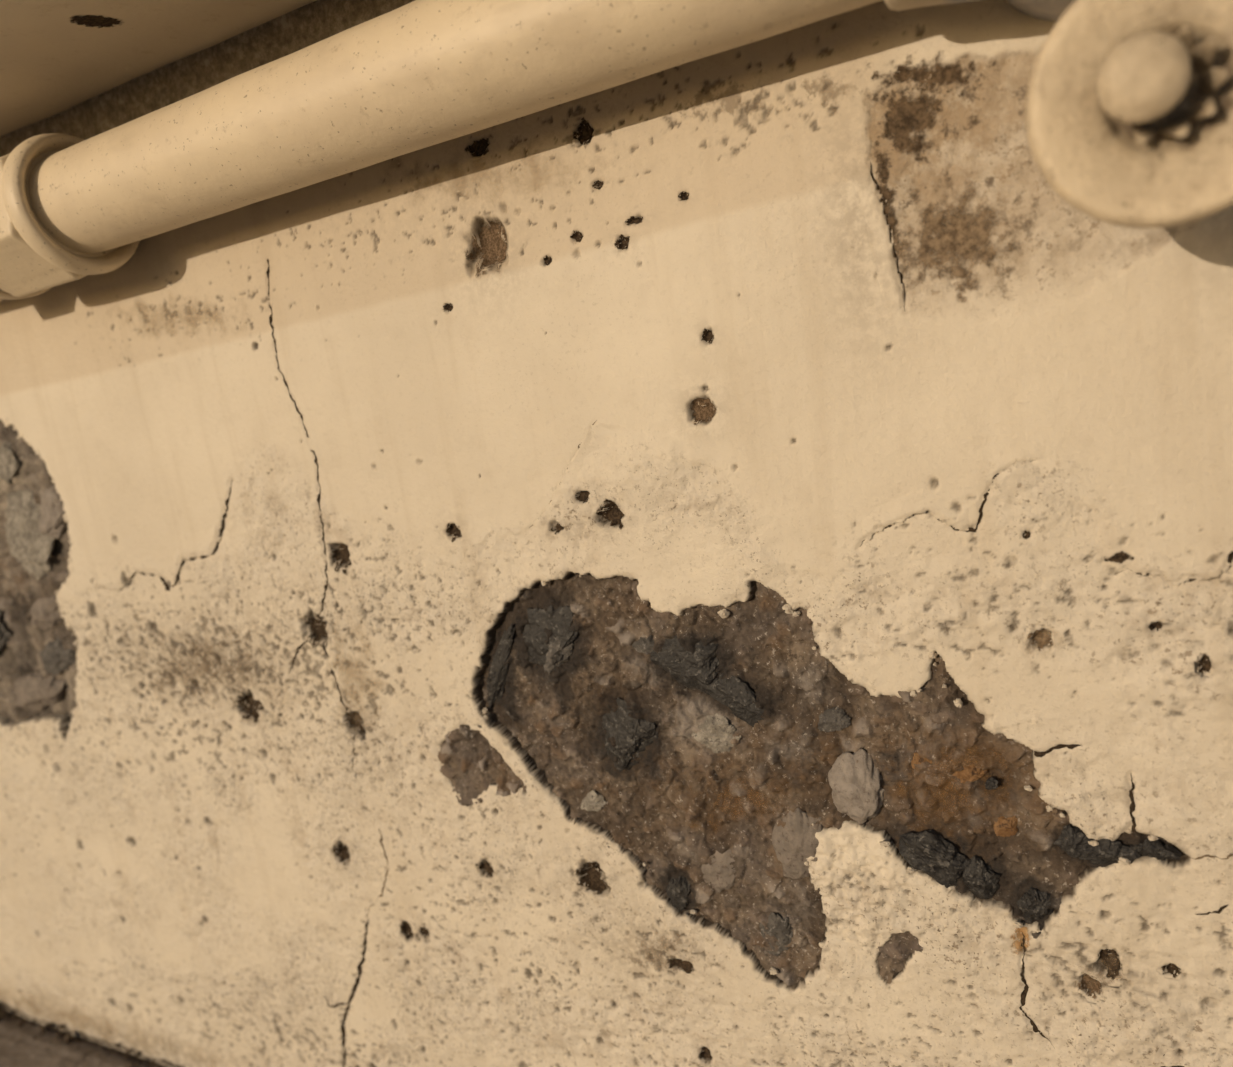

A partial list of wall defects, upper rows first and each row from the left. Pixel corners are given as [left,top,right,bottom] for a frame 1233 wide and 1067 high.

crack [870,162,905,310]
spalling [0,420,78,722]
crack [98,479,233,591]
crack [266,259,357,778]
crack [861,473,999,545]
peeling [1104,547,1232,586]
spalling [437,573,1187,986]
crack [1019,933,1048,1039]